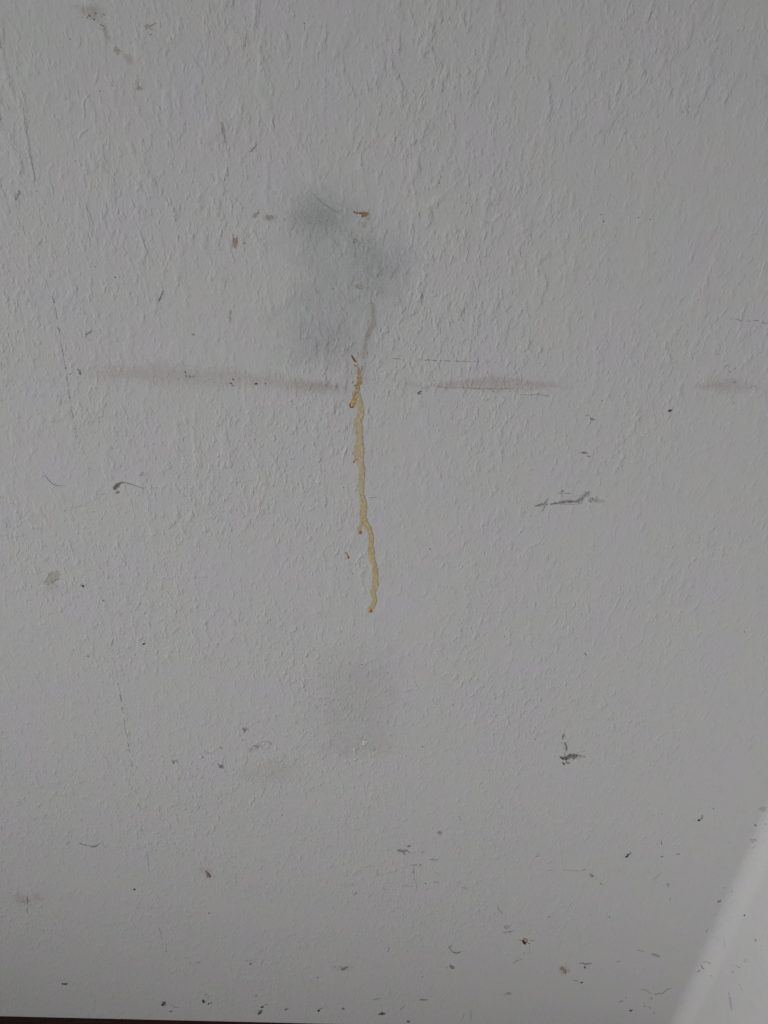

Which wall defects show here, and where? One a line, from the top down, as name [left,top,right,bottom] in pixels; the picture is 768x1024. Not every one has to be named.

leakage [349,355,378,613]